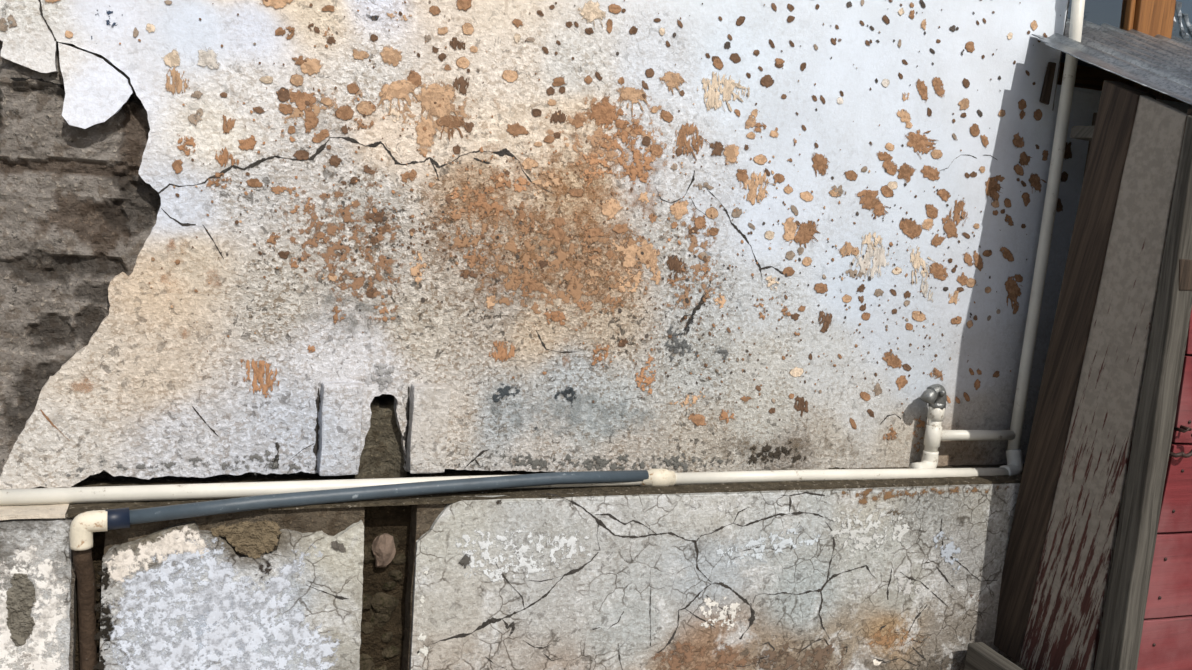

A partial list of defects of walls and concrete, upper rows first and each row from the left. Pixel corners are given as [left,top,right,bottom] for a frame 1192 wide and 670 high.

crack [38,0,57,41]
spalling [0,41,161,476]
corrosion [275,180,403,321]
crack [158,137,554,259]
corrosion [377,84,455,136]
corrosion [435,183,647,329]
corrosion [546,97,675,199]
crack [680,282,711,331]
crack [656,170,784,276]
damp [93,561,114,670]
damp [331,541,346,553]
crack [417,492,997,670]